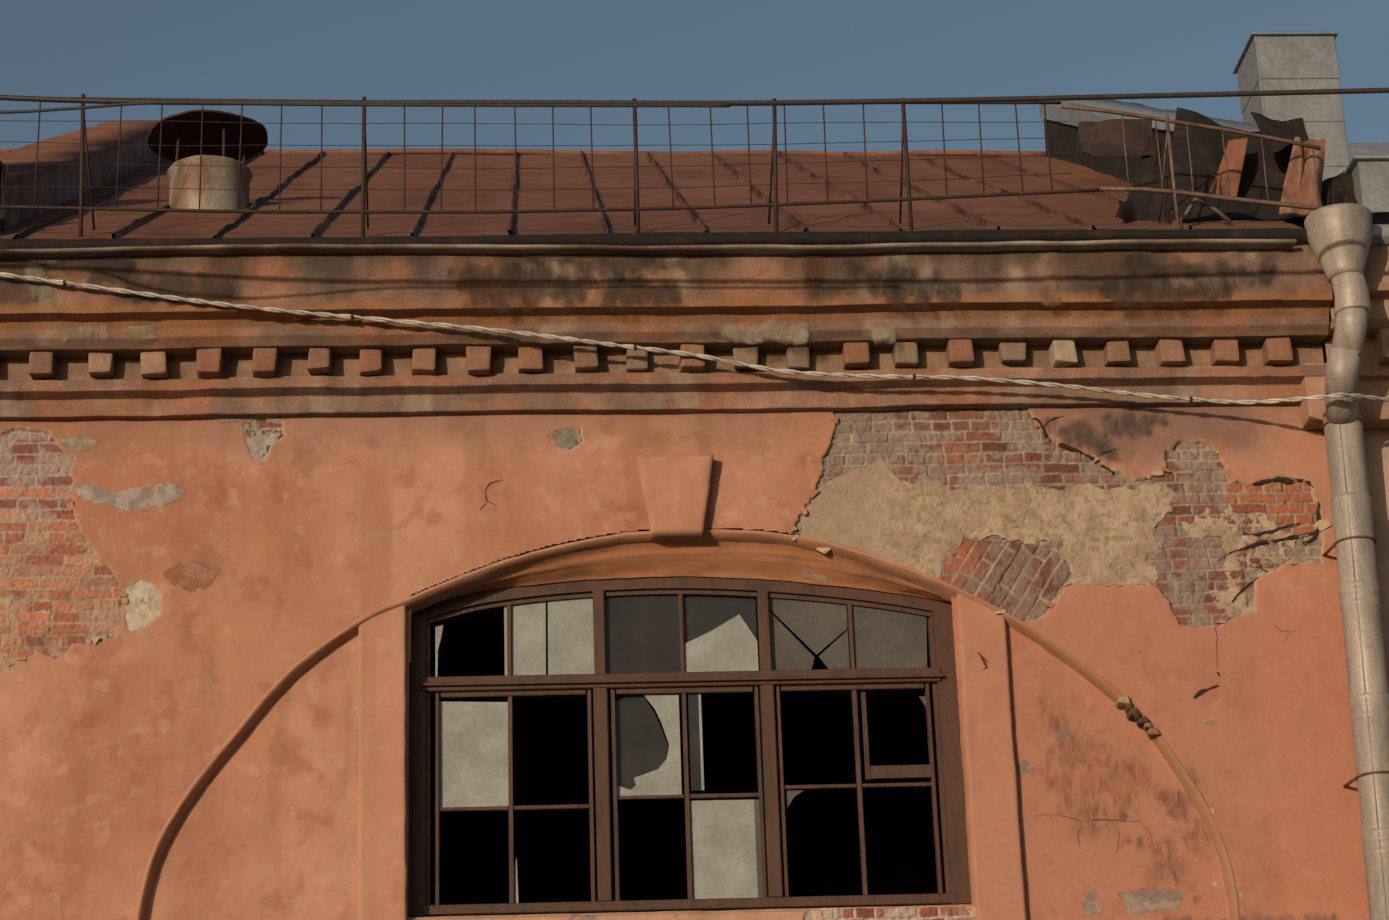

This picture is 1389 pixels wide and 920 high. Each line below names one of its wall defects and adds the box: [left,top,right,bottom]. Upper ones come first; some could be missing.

spalling [217,417,284,460]
spalling [553,428,582,449]
crack [1032,416,1118,476]
crack [479,480,502,511]
spalling [791,408,1332,627]
spalling [0,430,221,676]
crack [1193,477,1321,699]
spalling [804,905,975,920]